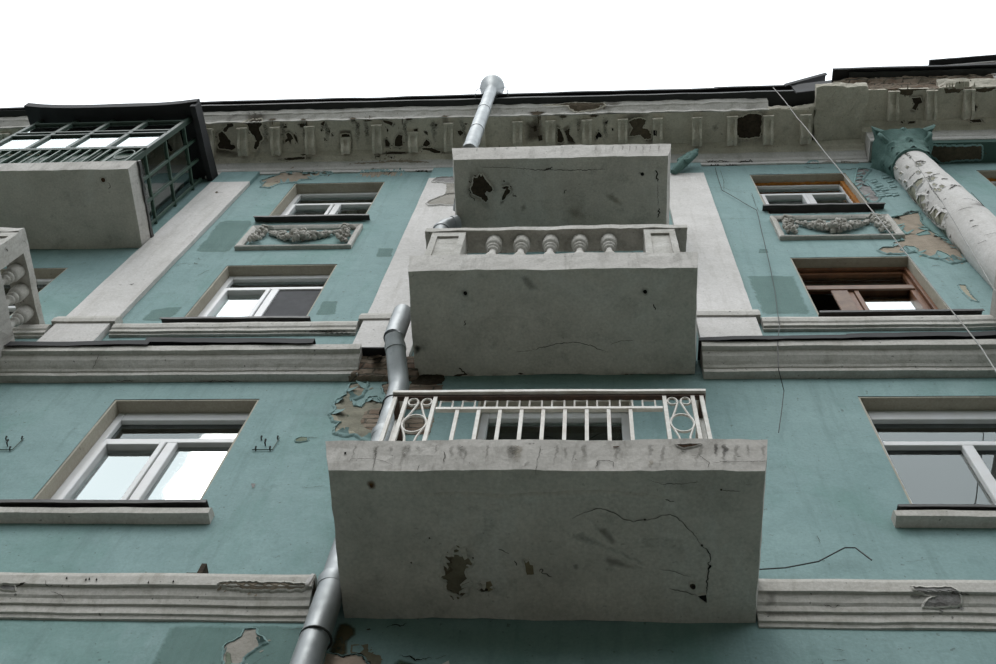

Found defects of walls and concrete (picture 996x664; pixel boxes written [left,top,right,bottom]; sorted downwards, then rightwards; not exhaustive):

spalling [215,115,307,153]
spalling [628,115,657,141]
spalling [737,112,763,140]
peeling [259,154,334,189]
spalling [469,172,516,203]
peeling [805,144,986,266]
peeling [327,355,389,441]
crack [572,454,763,604]
peeling [439,545,496,600]
peeling [910,585,969,614]
peeling [221,627,271,664]
peeling [322,651,371,664]